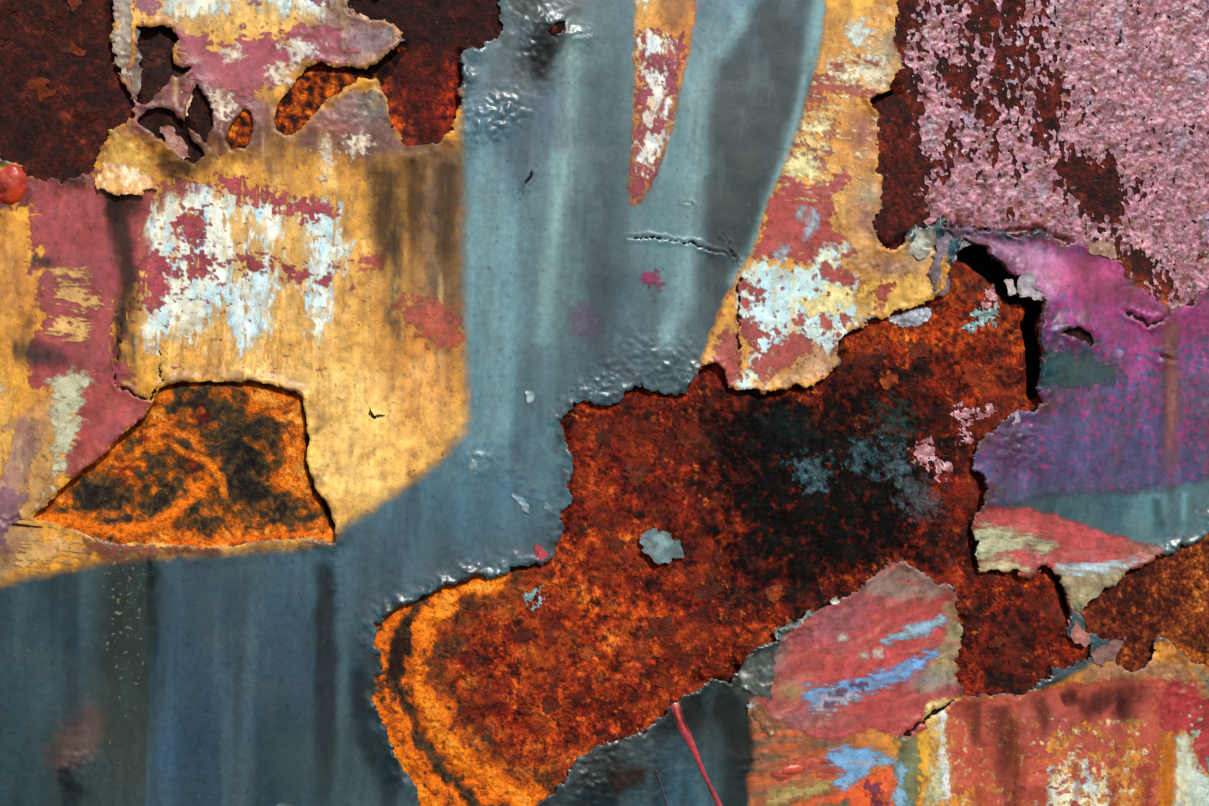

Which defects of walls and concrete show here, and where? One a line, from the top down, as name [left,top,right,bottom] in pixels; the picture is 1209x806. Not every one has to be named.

corrosion [0,0,213,184]
corrosion [274,0,504,147]
peeling [0,0,467,583]
crack [633,235,743,367]
corrosion [871,0,1209,452]
corrosion [34,380,335,548]
peeling [534,544,549,561]
peeling [639,528,685,564]
corrosion [372,259,1209,806]
peeling [701,0,1209,806]
water stain [109,557,158,738]
water stain [317,567,337,744]